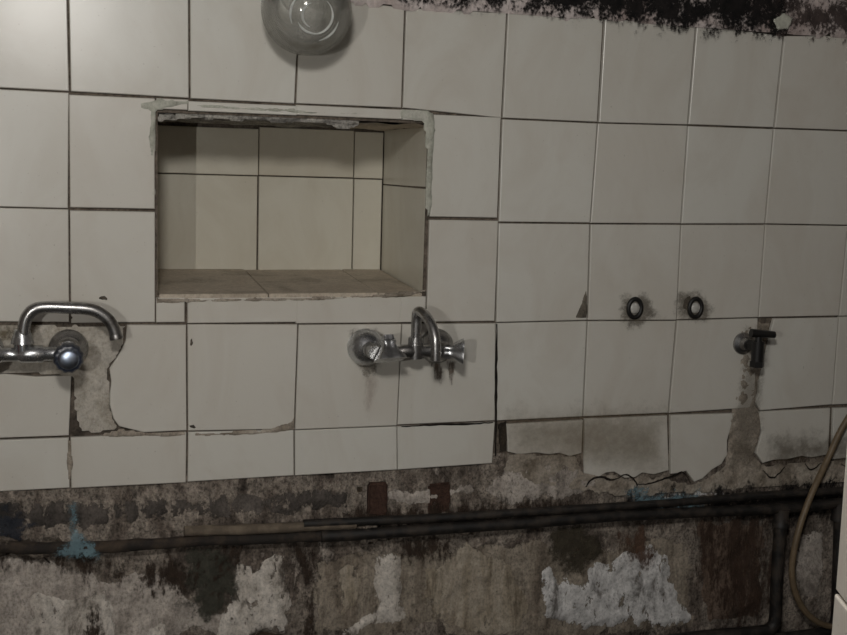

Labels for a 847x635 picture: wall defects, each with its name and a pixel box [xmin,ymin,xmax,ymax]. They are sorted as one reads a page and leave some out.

water stain [400,0,847,44]
spalling [0,316,125,433]
spalling [485,354,846,506]
flaking render [387,489,438,505]
flaking render [450,484,474,496]
water stain [707,476,844,506]
water stain [55,553,124,595]
water stain [294,544,318,635]
water stain [82,607,105,635]